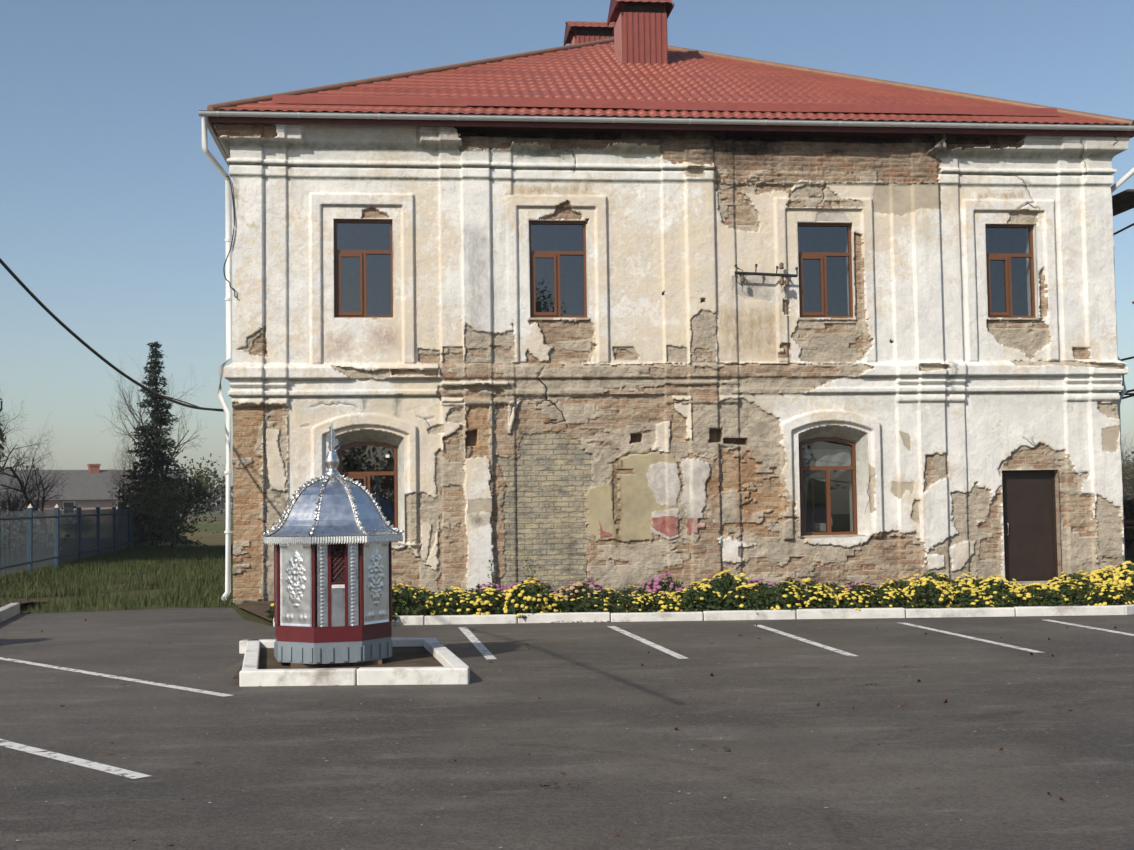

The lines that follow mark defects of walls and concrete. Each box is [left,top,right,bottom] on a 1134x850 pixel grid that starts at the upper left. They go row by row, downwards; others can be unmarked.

spalling [458,131,1026,232]
spalling [238,326,269,357]
crack [509,365,567,426]
spalling [392,233,1124,595]
spalling [232,401,288,605]